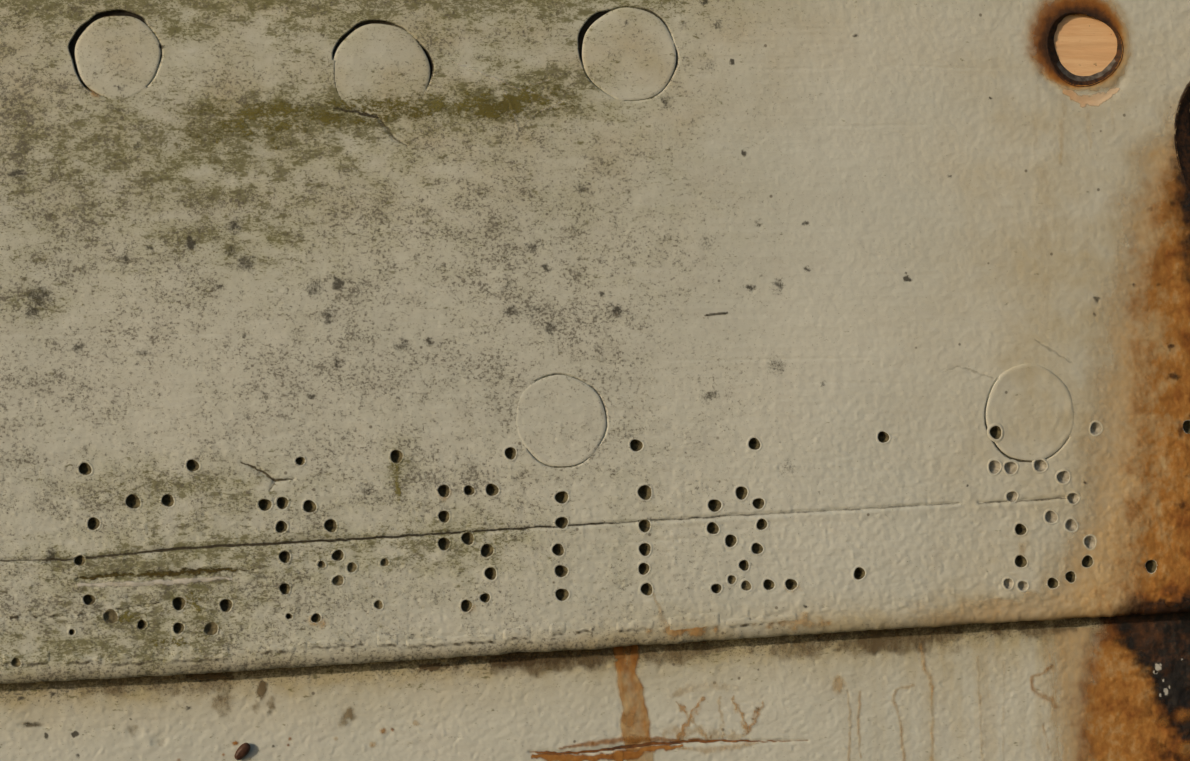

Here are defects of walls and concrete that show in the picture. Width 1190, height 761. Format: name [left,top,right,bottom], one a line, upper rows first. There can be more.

corrosion [1031,0,1130,107]
corrosion [934,122,1190,761]
corrosion [666,626,717,637]
leakage [419,662,460,672]
leakage [475,649,613,676]
leakage [643,641,720,663]
corrosion [613,645,653,761]
crack [531,737,801,761]